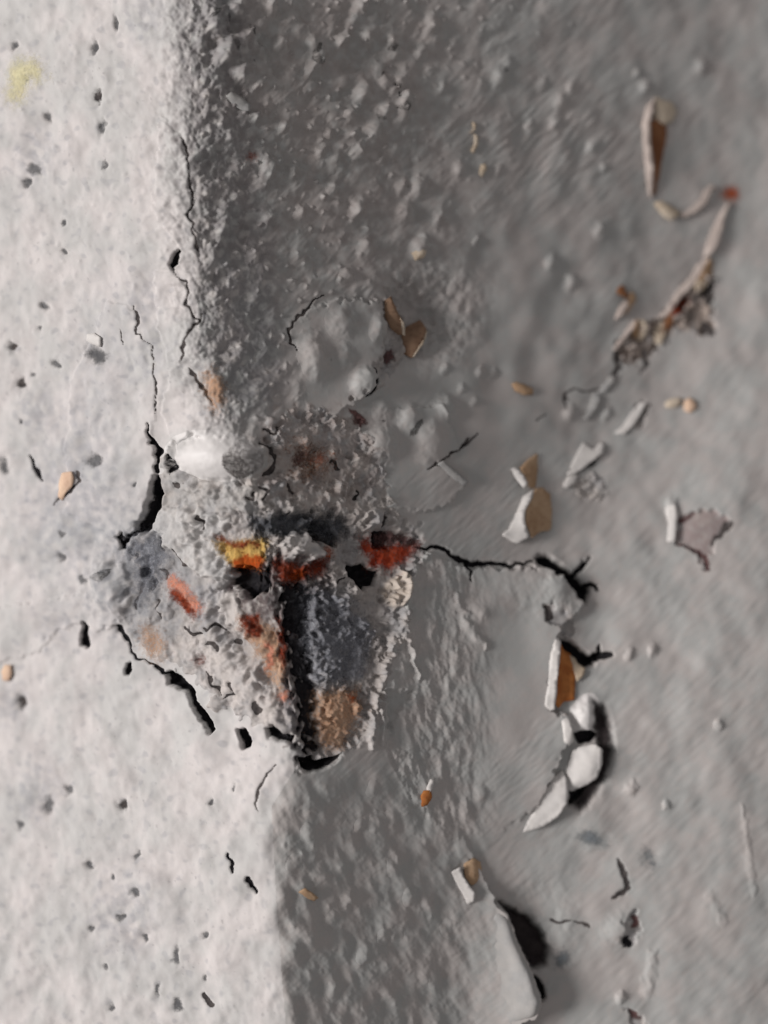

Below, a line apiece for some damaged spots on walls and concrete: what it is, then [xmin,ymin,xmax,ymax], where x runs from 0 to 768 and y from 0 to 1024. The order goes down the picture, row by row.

peeling [612,202,732,365]
crack [120,305,179,543]
spalling [121,406,425,764]
corrosion [216,536,331,583]
corrosion [361,531,420,569]
crack [417,545,598,602]
peeling [665,503,733,571]
crack [117,625,216,733]
corrosion [240,615,287,701]
peeling [523,602,603,832]
crack [561,641,613,667]
peeling [494,901,541,1024]